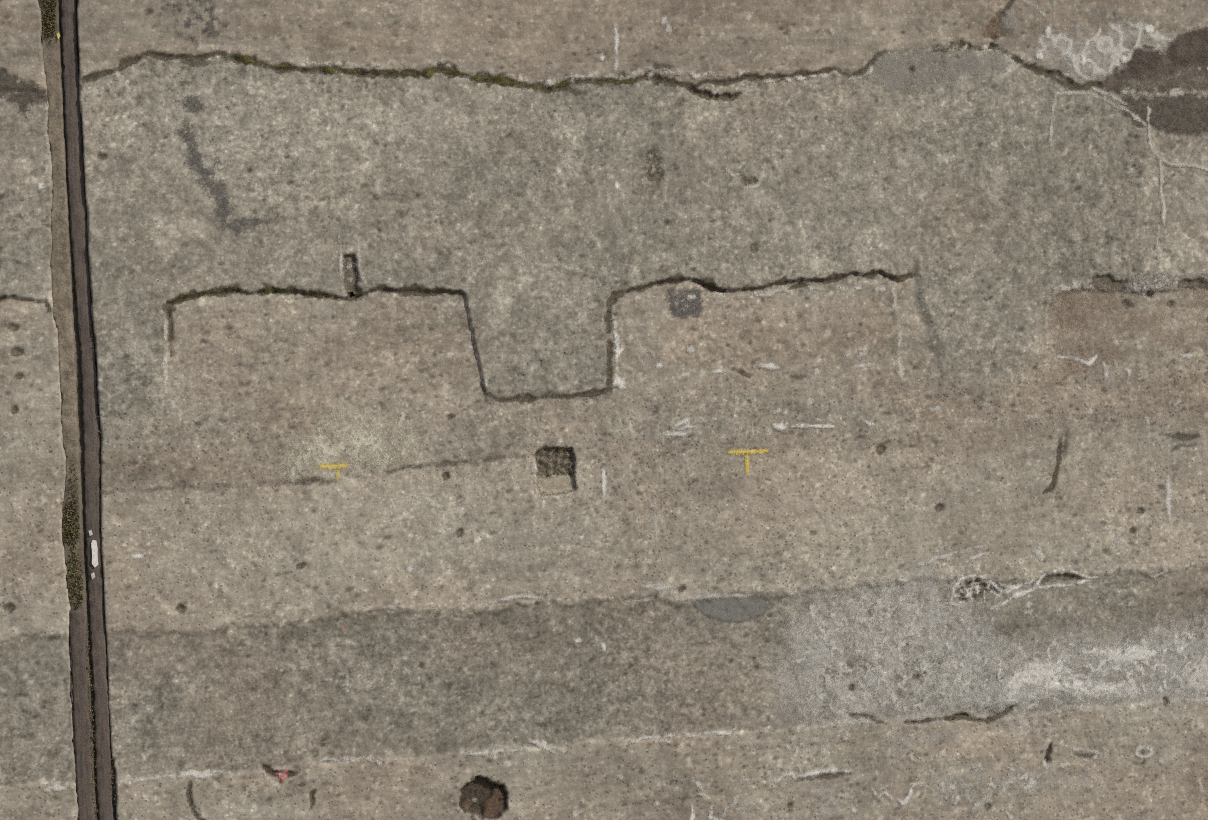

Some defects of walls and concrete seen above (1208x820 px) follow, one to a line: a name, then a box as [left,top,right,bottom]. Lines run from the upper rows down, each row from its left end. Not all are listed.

crack [80,51,884,101]
leakage [1036,21,1208,136]
crack [161,283,465,396]
crack [477,247,915,403]
crack [849,706,1015,725]